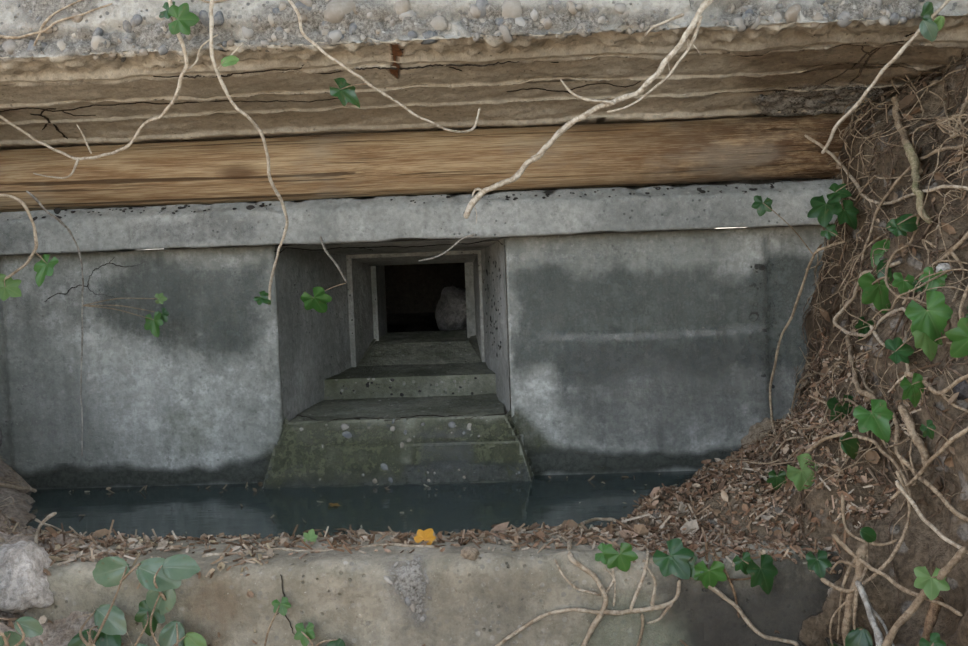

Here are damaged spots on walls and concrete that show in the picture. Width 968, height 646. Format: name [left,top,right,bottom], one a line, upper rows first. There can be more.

crack [153,61,519,79]
rust [389,43,404,79]
crack [507,81,641,94]
crack [0,98,339,139]
water stain [13,256,821,490]